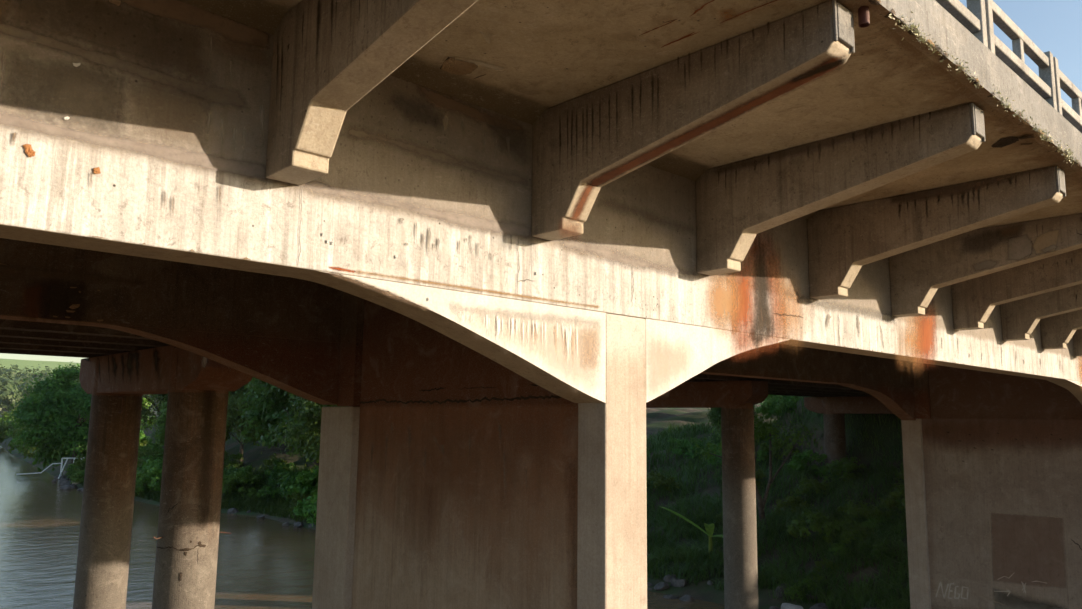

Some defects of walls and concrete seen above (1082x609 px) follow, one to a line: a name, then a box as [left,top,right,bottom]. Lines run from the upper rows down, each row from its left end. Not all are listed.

rust [564,56,846,231]
rust [710,239,797,347]
damp [484,315,594,362]
rust [905,308,936,359]
crack [360,384,562,404]
crack [156,541,206,582]